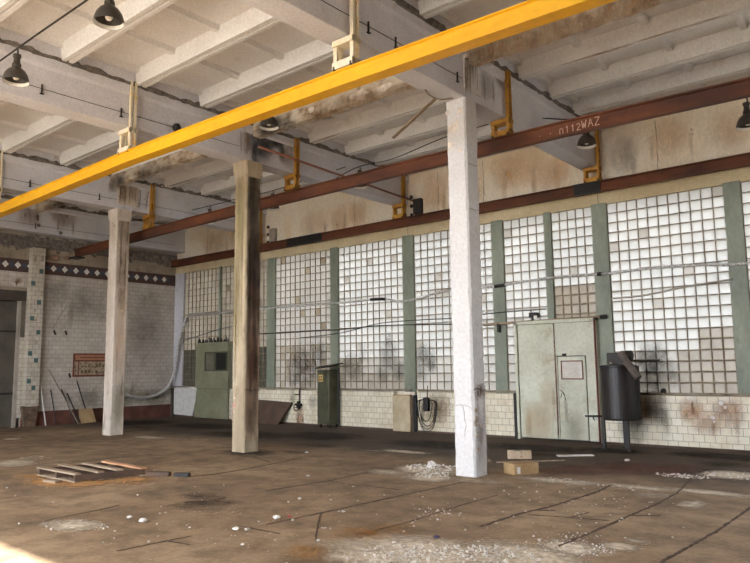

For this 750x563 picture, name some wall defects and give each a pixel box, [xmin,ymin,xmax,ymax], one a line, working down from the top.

peeling [349,80,401,100]
leakage [110,176,132,198]
spalling [0,214,109,257]
spalling [120,250,177,267]